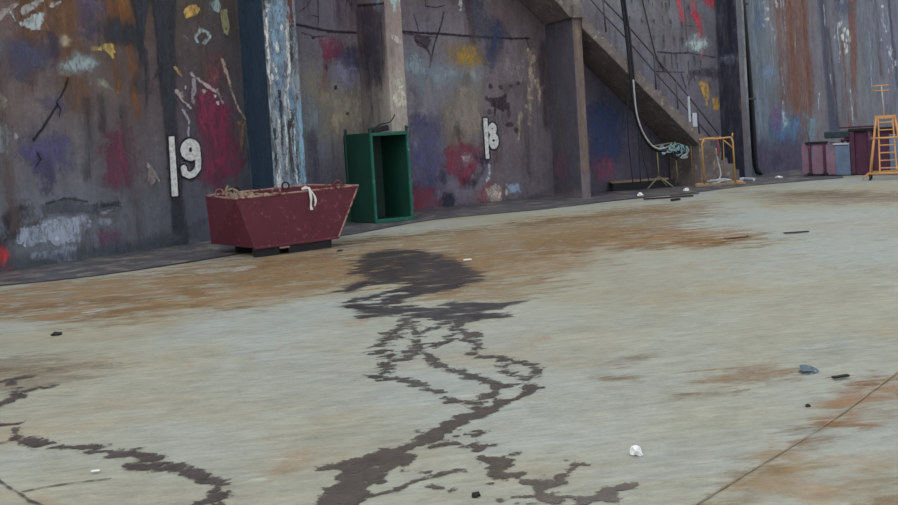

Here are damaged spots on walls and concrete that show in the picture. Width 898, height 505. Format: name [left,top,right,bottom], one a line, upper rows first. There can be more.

corrosion [20,0,90,113]
peeling [262,0,306,187]
corrosion [776,0,813,134]
corrosion [842,0,857,126]
damp [0,374,59,406]
damp [314,249,640,505]
corrosion [824,383,898,427]
crack [0,478,109,505]
damp [0,420,237,505]